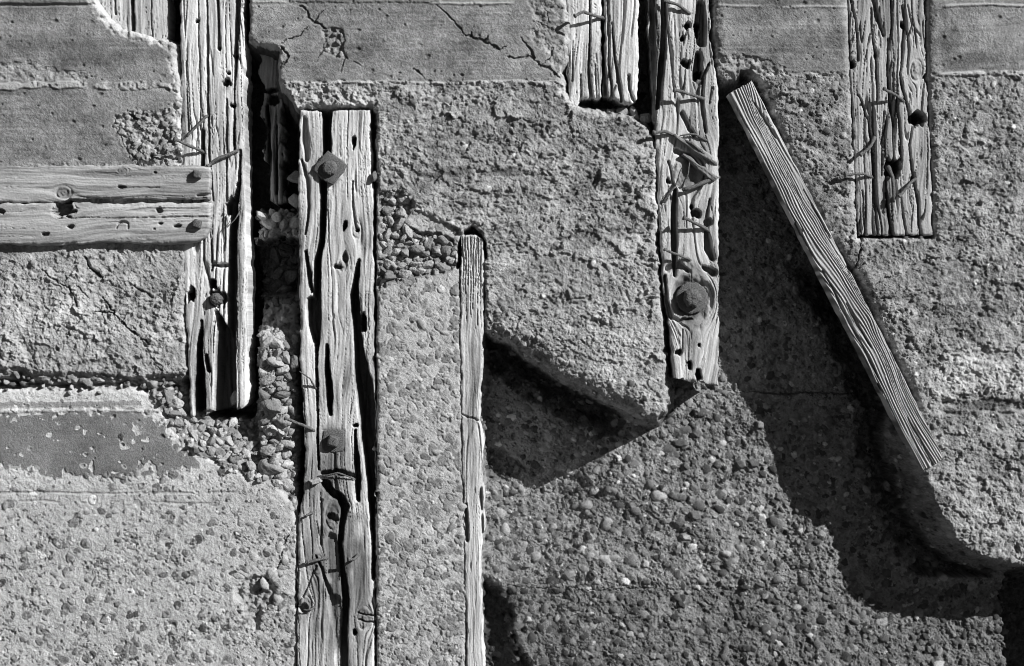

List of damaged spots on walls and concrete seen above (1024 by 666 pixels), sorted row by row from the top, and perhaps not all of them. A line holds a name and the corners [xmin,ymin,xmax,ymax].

crack [280,5,360,73]
crack [436,4,565,79]
spalling [111,99,183,167]
spalling [376,191,457,288]
crack [41,256,164,372]
peeling [0,208,302,497]